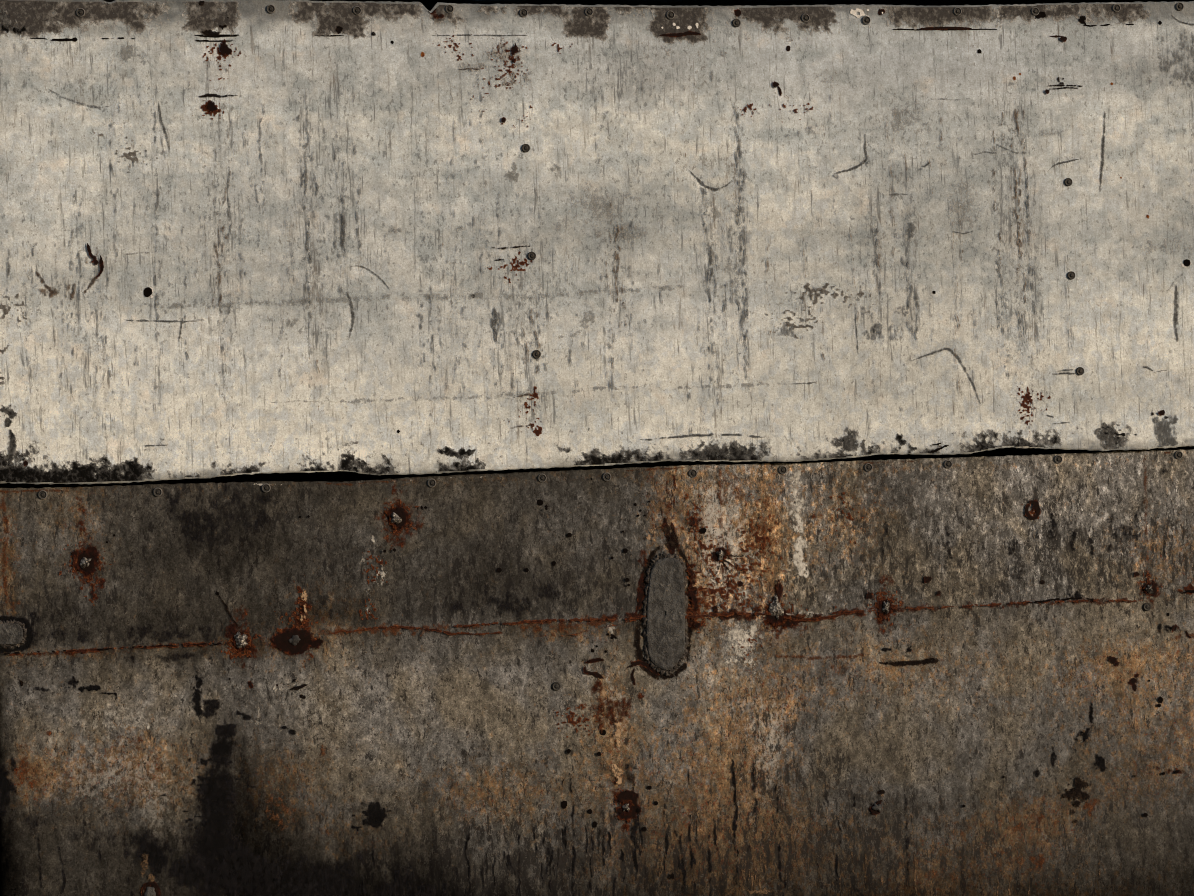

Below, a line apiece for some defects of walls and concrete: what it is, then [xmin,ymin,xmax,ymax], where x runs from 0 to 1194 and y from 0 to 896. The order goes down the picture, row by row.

peeling [478,4,1150,57]
corrosion [438,34,531,112]
peeling [0,405,201,483]
peeling [288,441,400,475]
peeling [436,443,501,473]
peeling [554,433,775,480]
peeling [797,422,1079,460]
corrosion [318,479,428,550]
corrosion [1022,499,1041,520]
corrosion [55,498,112,605]
corrosion [853,576,907,633]
corrosion [554,467,869,850]